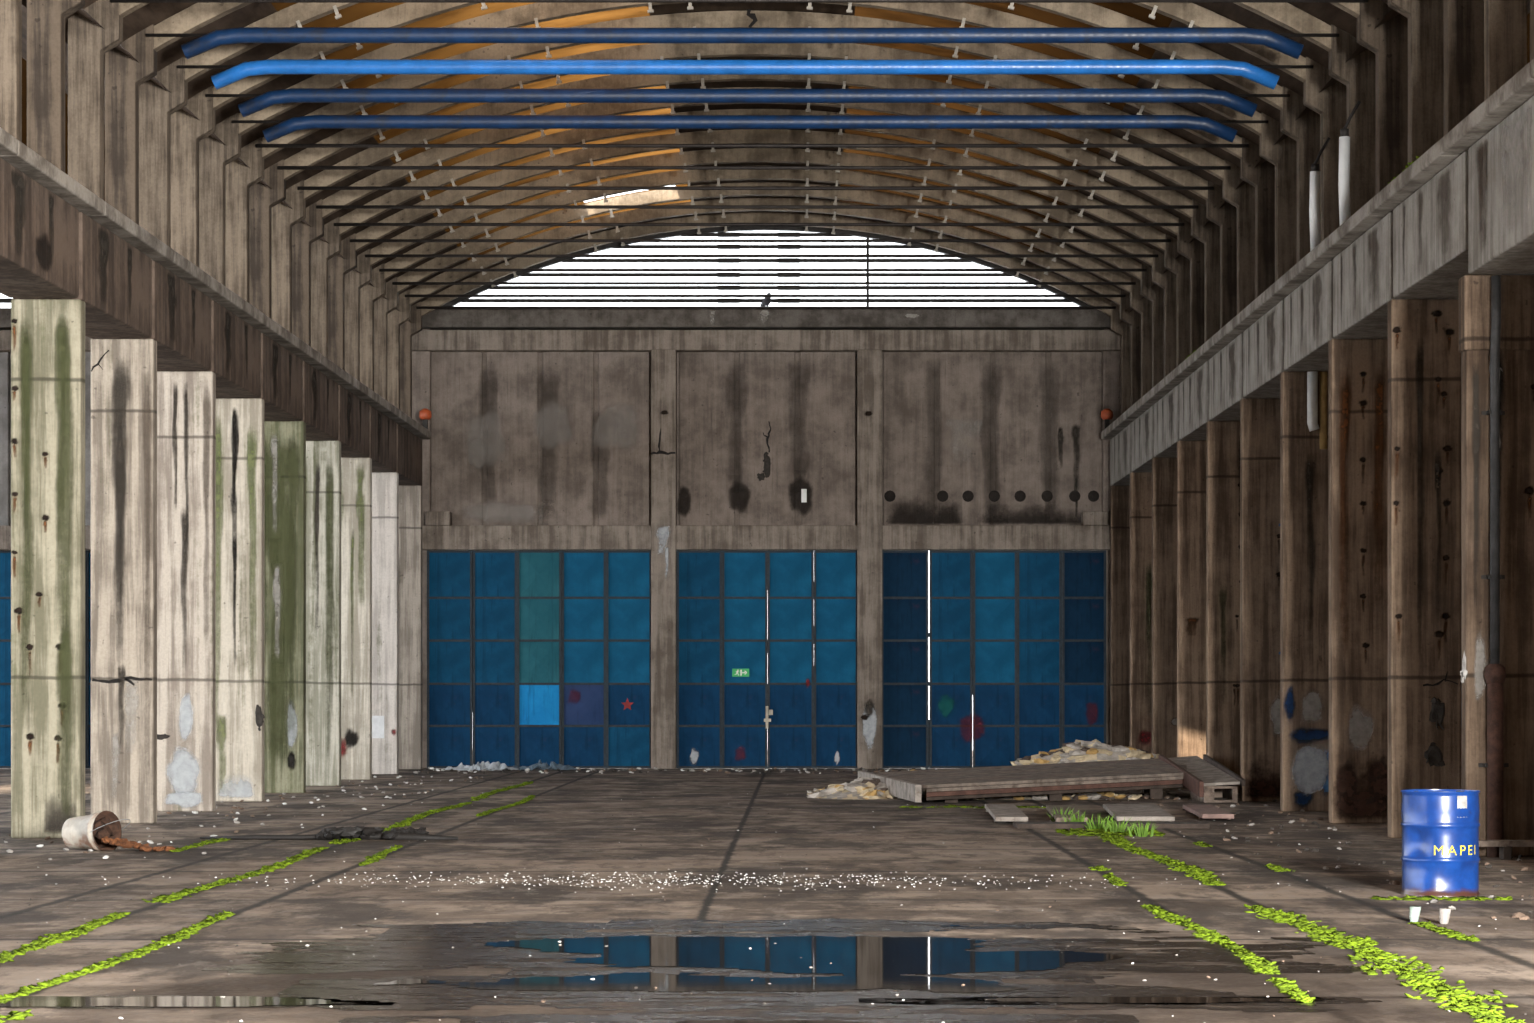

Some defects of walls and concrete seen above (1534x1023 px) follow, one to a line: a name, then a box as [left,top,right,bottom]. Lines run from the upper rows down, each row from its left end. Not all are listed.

damp [14,592,43,665]
damp [45,631,75,832]
damp [112,367,151,623]
damp [172,388,210,630]
damp [231,410,239,654]
damp [265,439,333,724]
damp [351,471,364,630]
damp [1335,709,1388,819]